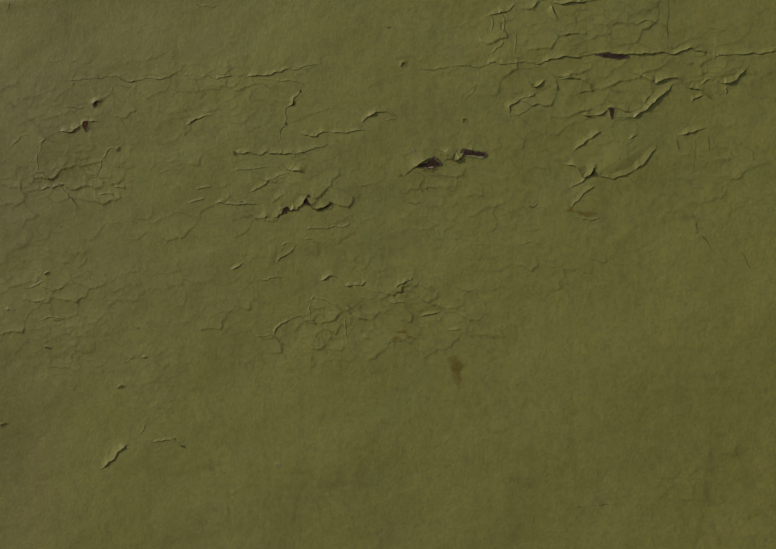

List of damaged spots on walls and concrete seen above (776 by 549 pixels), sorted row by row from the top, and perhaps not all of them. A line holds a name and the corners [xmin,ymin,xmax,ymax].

peeling [581,79,675,120]
peeling [400,142,488,177]
peeling [257,193,334,218]
crack [228,240,368,355]